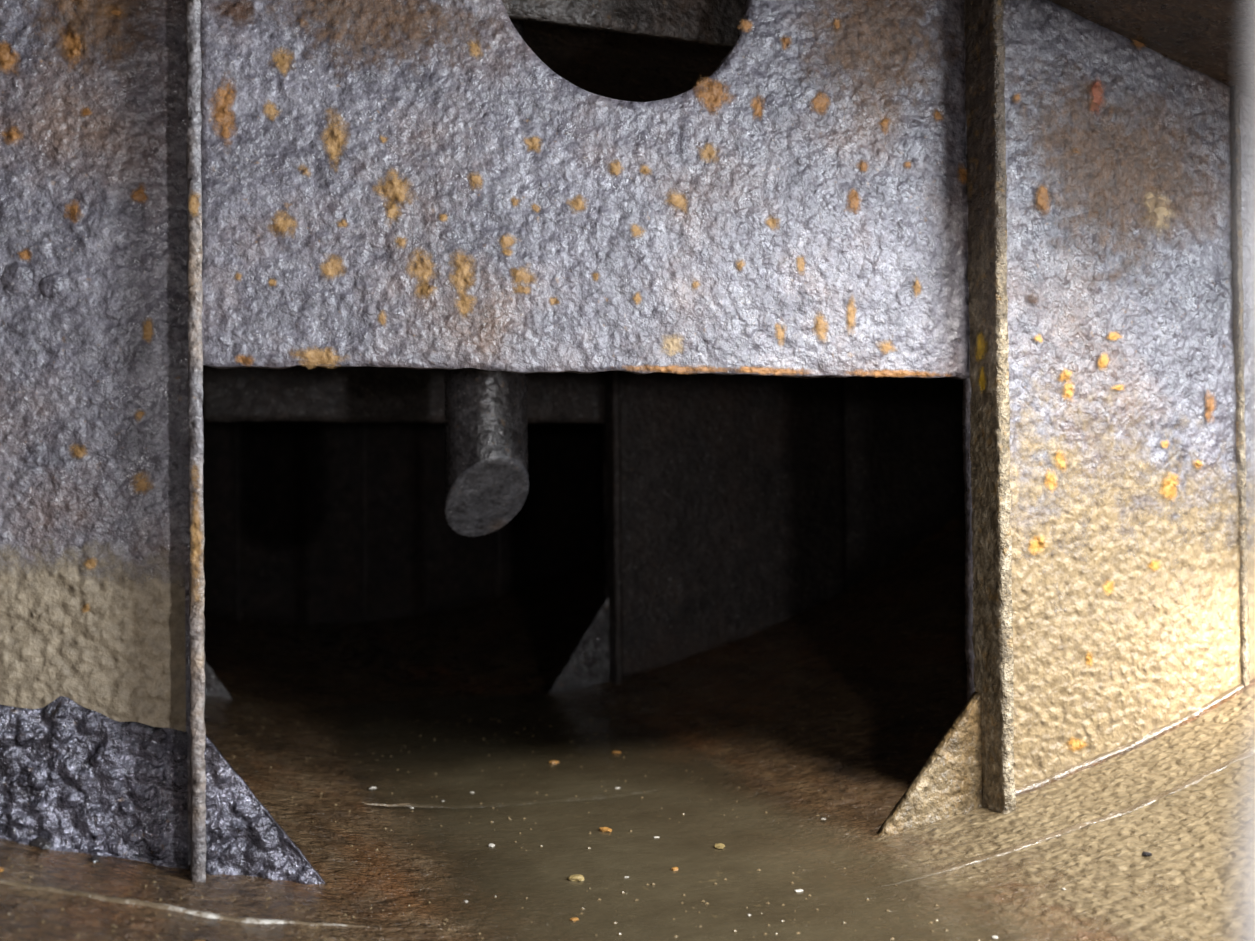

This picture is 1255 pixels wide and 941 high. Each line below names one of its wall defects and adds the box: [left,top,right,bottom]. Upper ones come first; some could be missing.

corrosion [297,0,459,59]
corrosion [696,79,730,112]
corrosion [323,109,347,161]
corrosion [848,189,860,214]
corrosion [396,237,435,296]
corrosion [451,254,476,315]
corrosion [500,235,535,294]
corrosion [815,315,827,340]
corrosion [291,348,342,367]
corrosion [629,337,721,374]
corrosion [738,366,807,375]
corrosion [1010,411,1255,788]